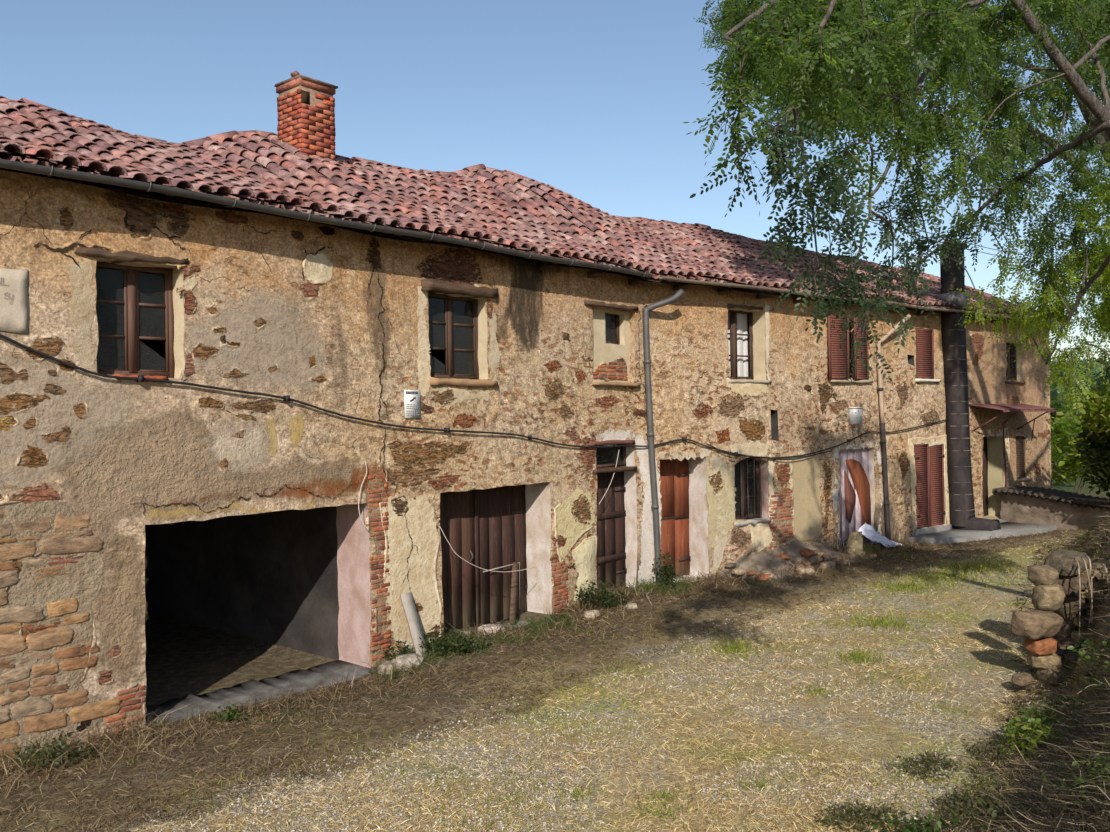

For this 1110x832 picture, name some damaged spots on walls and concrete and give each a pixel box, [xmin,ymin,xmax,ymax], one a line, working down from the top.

crack [34,230,113,267]
crack [112,203,190,252]
flaking render [416,247,483,285]
leakage [464,248,543,351]
flaking render [0,334,89,468]
crack [367,239,418,604]
flaking render [543,356,628,476]
flaking render [692,393,767,446]
crack [130,484,353,516]
flaking render [550,494,593,613]
flaking render [730,463,794,549]
flaking render [0,483,147,761]